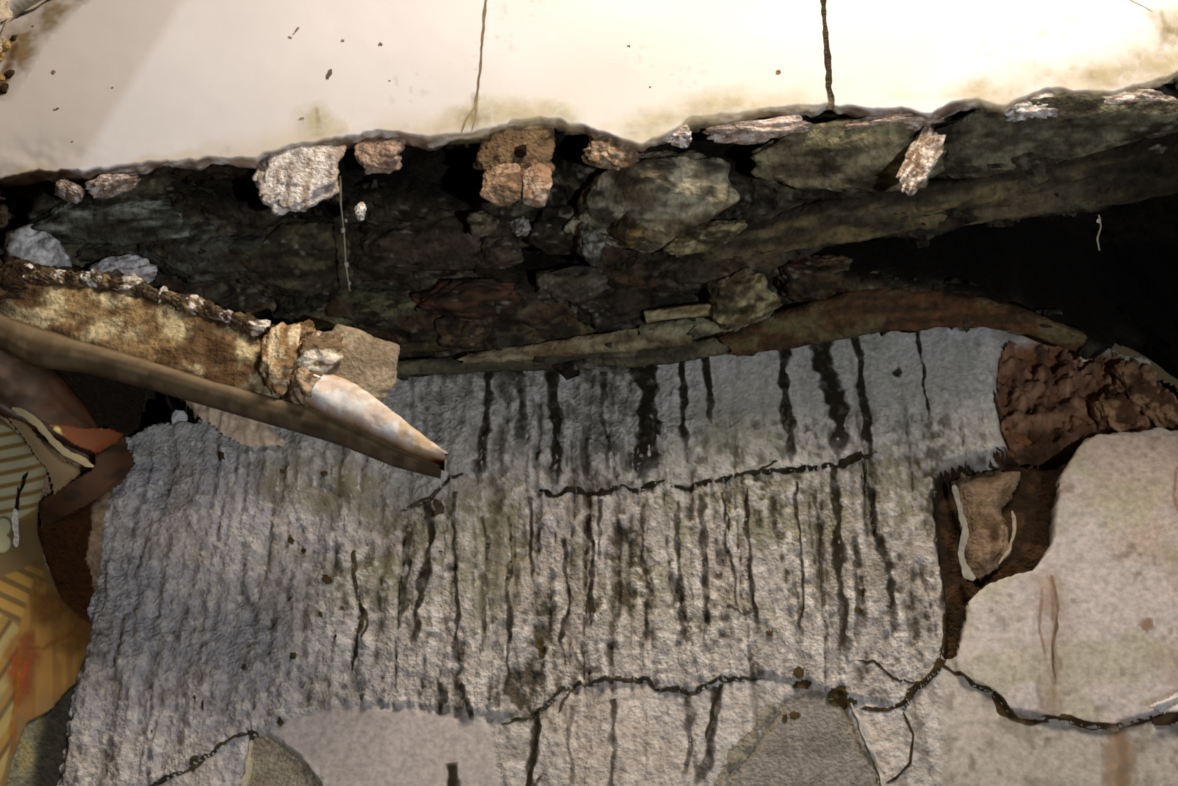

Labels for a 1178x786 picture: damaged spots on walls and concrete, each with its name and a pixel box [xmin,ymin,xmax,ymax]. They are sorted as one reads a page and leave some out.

crack [461,0,487,133]
crack [820,0,835,109]
leakage [629,365,662,473]
leakage [778,349,797,457]
leakage [401,501,436,642]
crack [539,451,877,498]
leakage [810,337,873,650]
leakage [861,461,897,617]
crack [1051,575,1059,680]
leakage [526,718,542,786]
crack [501,675,764,785]
crack [858,613,1160,783]